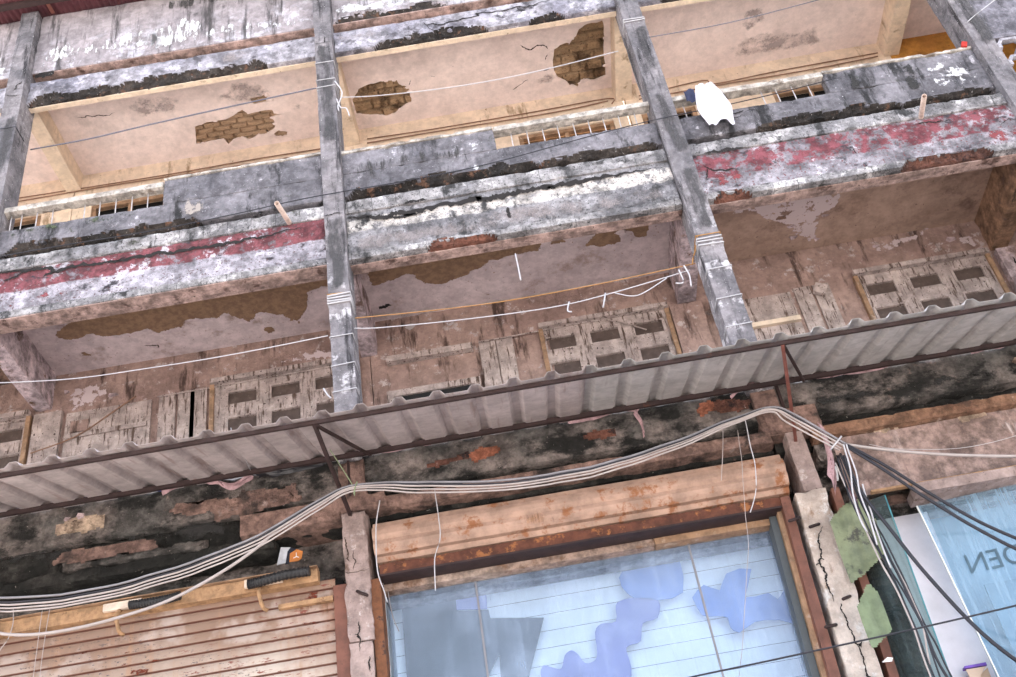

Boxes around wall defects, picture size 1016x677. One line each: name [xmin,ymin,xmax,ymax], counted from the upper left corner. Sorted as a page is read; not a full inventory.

water stain [41,0,295,67]
spalling [529,11,565,26]
spalling [553,21,608,86]
spalling [28,59,268,109]
spalling [195,93,287,145]
spalling [352,79,412,115]
crack [325,168,651,228]
peeling [714,189,841,242]
crack [0,228,297,281]
peeling [56,279,328,342]
water stain [816,388,868,405]
crack [816,527,871,677]